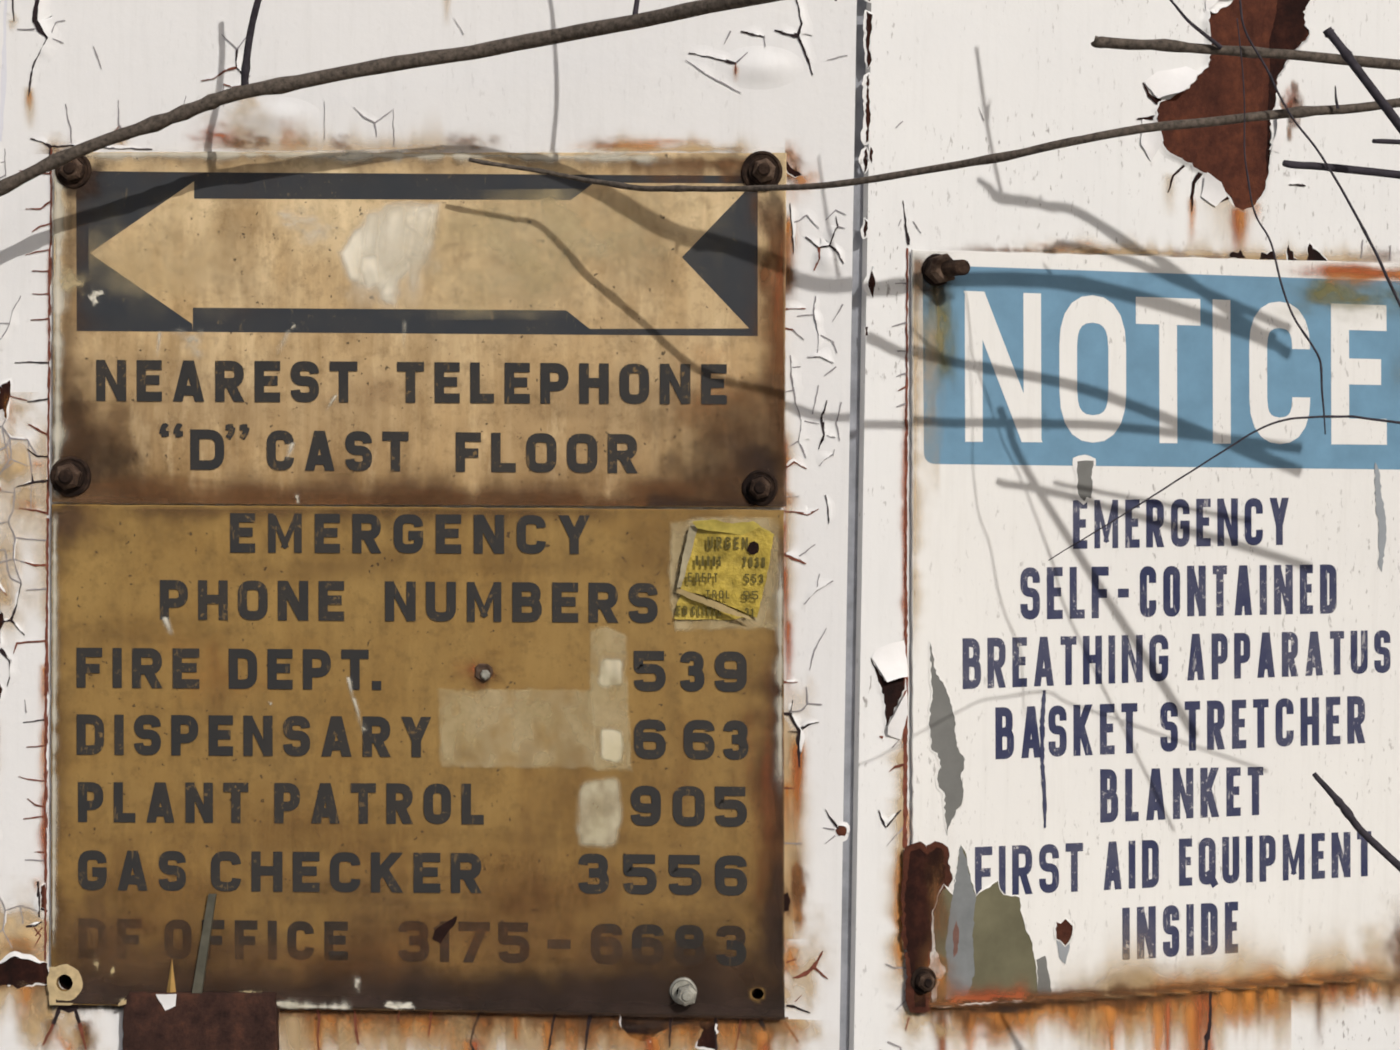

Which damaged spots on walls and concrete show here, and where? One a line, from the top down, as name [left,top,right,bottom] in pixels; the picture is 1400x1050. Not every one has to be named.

crack [184,35,253,107]
corrosion [607,141,745,183]
crack [685,0,847,93]
peeling [1137,0,1313,213]
peeling [0,377,14,423]
crack [0,0,153,960]
crack [784,203,846,789]
crack [878,200,921,848]
peeling [0,610,8,705]
corrosion [0,213,815,1050]
peeling [0,951,50,989]
corrosion [905,930,1400,1050]